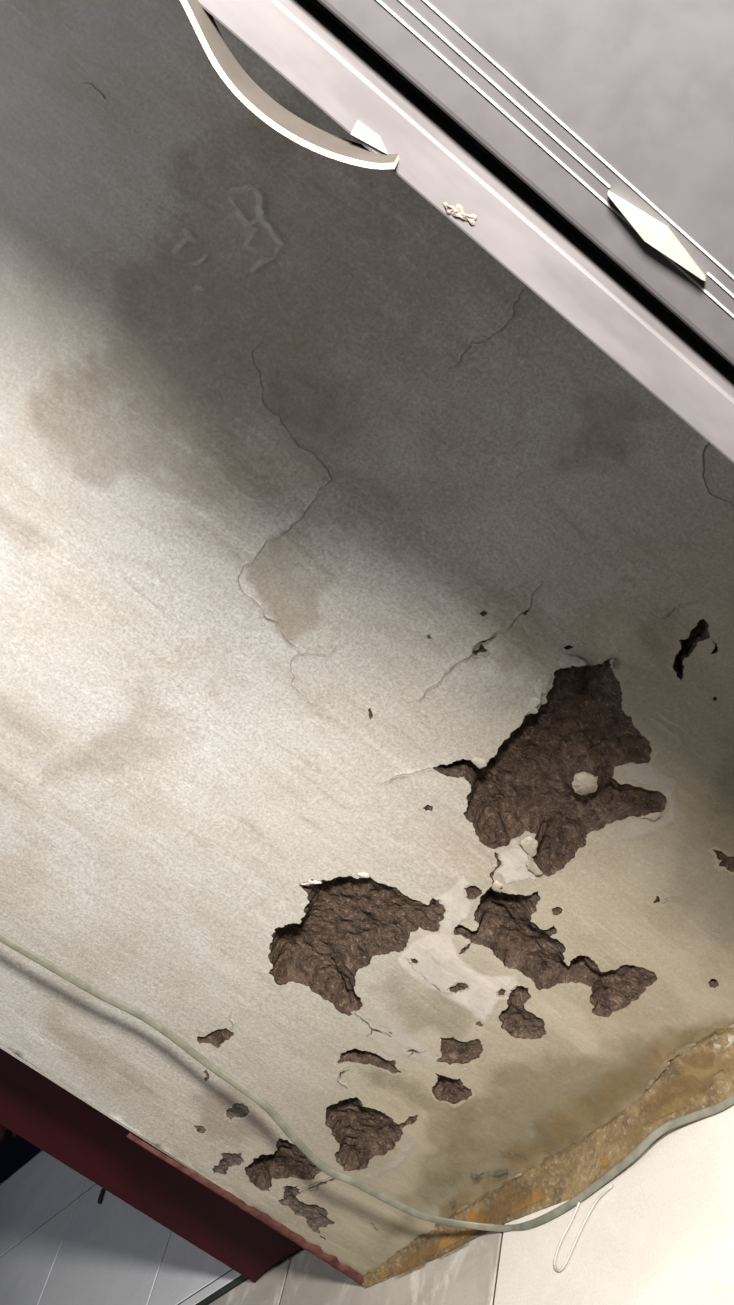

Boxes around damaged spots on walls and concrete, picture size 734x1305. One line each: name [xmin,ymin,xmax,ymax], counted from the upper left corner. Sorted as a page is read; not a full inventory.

crack [233,336,395,704]
crack [695,438,734,510]
crack [406,580,543,703]
spalling [673,619,718,680]
spalling [268,645,673,1104]
spalling [226,1103,250,1121]
spalling [325,1097,418,1171]
spalling [213,1138,335,1238]
corrosion [381,1186,544,1278]